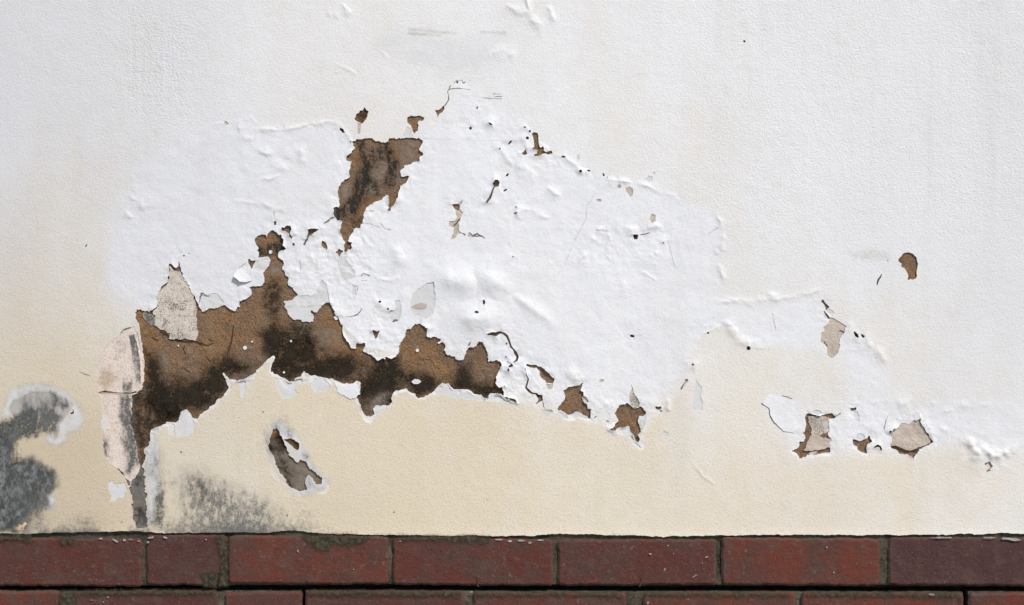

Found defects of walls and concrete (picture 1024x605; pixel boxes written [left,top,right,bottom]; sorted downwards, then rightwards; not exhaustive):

peeling [887,252,918,280]
peeling [95,108,517,528]
flaking render [821,300,846,358]
leakage [0,384,83,532]
peeling [525,364,662,448]
flaking render [761,395,872,458]
flaking render [889,419,933,458]